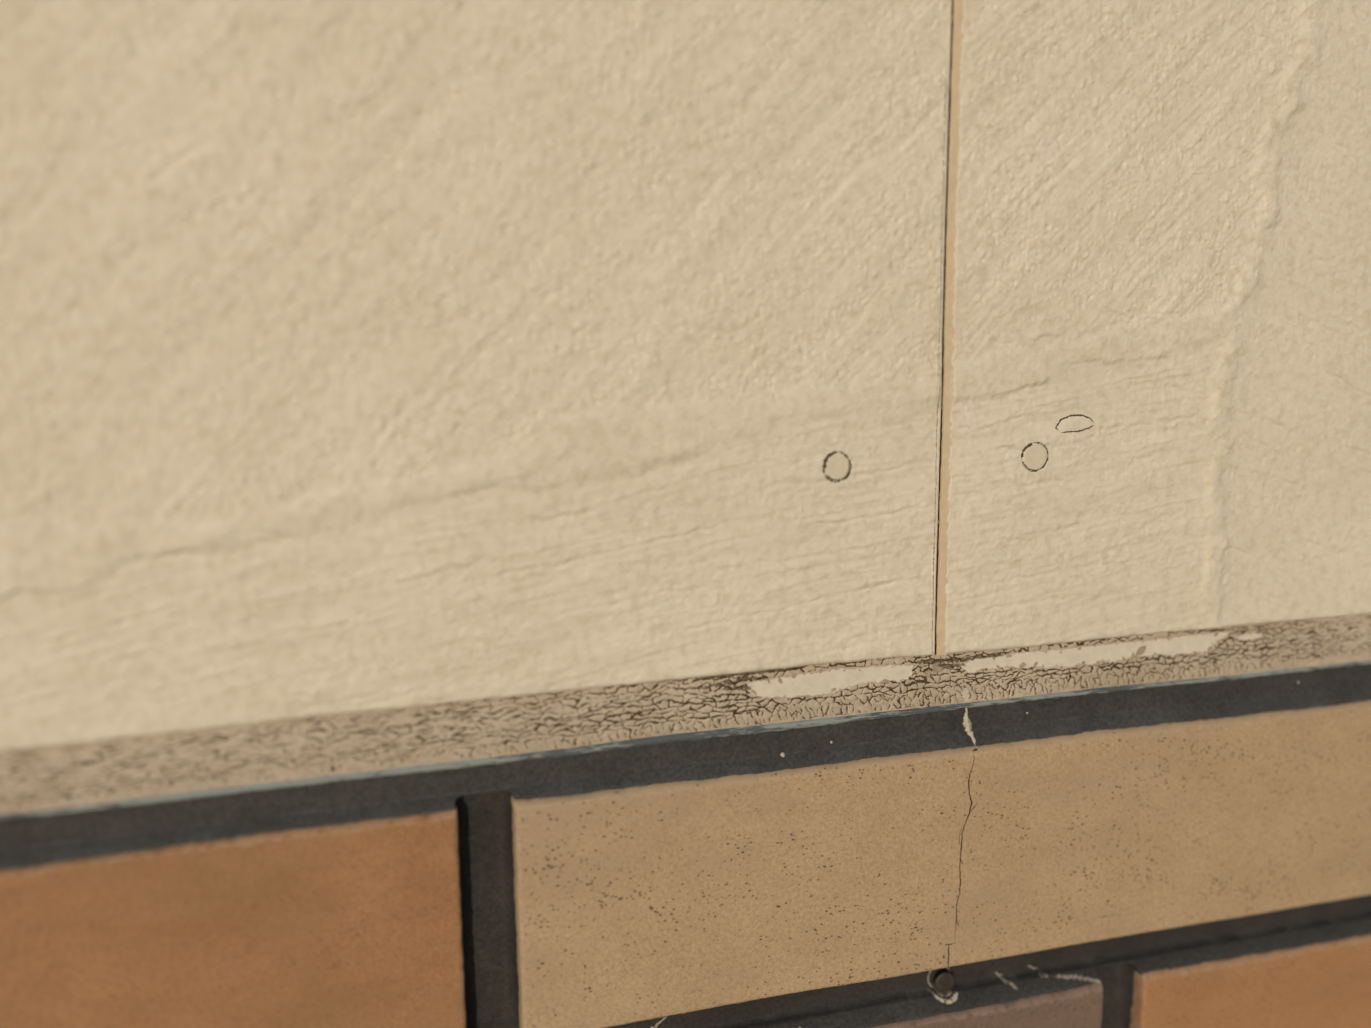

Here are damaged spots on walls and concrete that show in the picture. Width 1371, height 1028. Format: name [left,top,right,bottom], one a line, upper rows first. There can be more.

crack [0,0,1371,811]
peeling [747,632,1262,700]
crack [945,749,978,967]